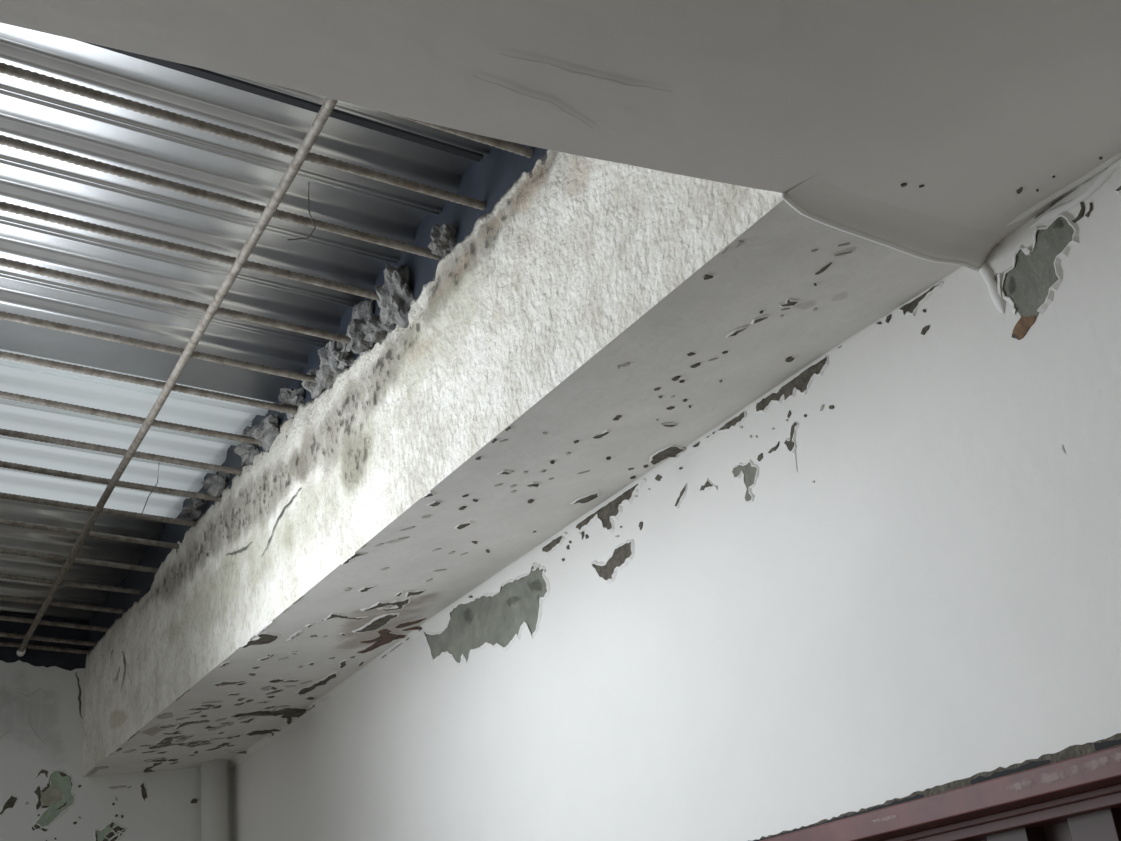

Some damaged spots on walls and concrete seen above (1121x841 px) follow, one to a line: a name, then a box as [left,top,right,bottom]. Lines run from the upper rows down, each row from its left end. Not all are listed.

water stain [428,161,552,299]
peeling [672,351,728,383]
peeling [725,298,799,337]
peeling [814,243,852,286]
peeling [876,282,944,335]
peeling [995,202,1093,340]
water stain [156,315,425,599]
peeling [0,356,829,841]